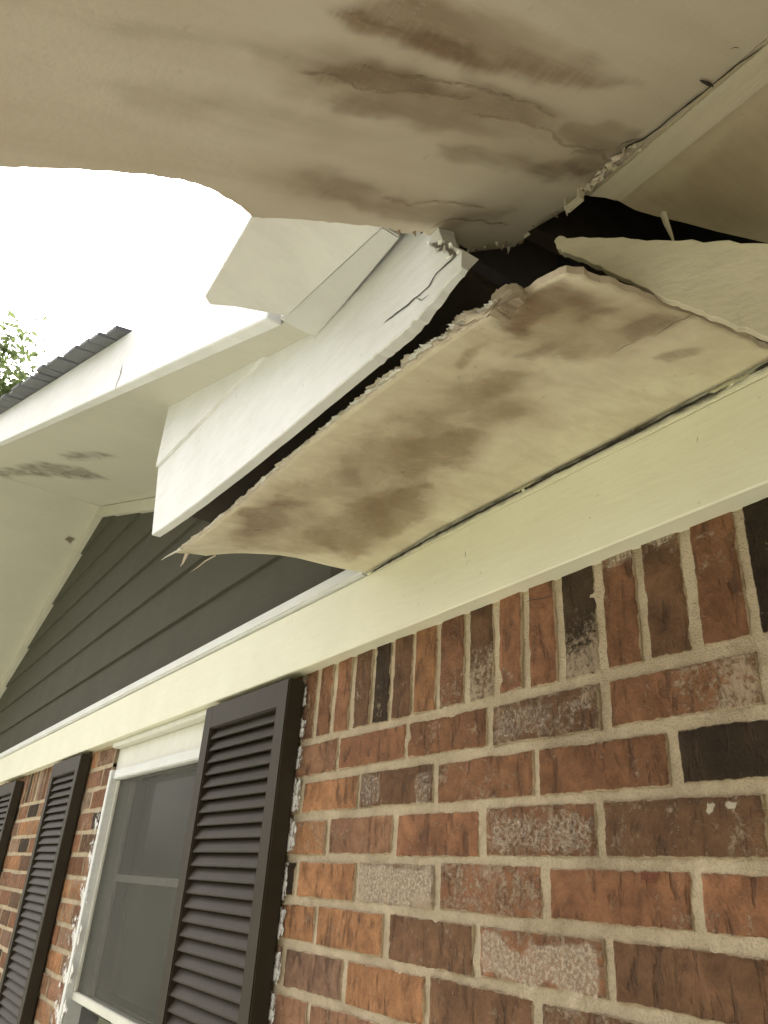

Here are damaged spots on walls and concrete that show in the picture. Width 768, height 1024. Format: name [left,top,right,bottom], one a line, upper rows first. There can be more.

peeling [426,238,462,260]
crack [385,256,456,322]
crack [371,362,768,573]
leakage [539,421,653,480]